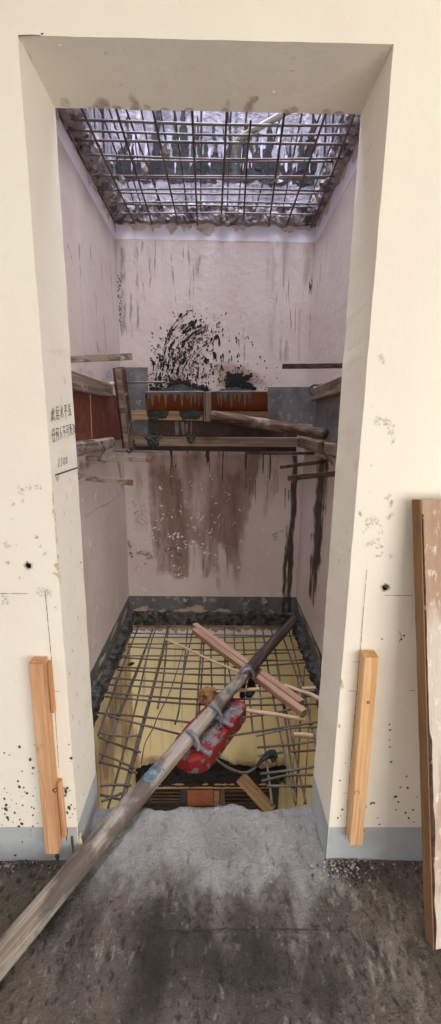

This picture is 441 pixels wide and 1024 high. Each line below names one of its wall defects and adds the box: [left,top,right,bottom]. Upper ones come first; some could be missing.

spalling [55,108,361,235]
leakage [127,451,271,578]
leakage [272,456,298,613]
leakage [309,456,329,604]